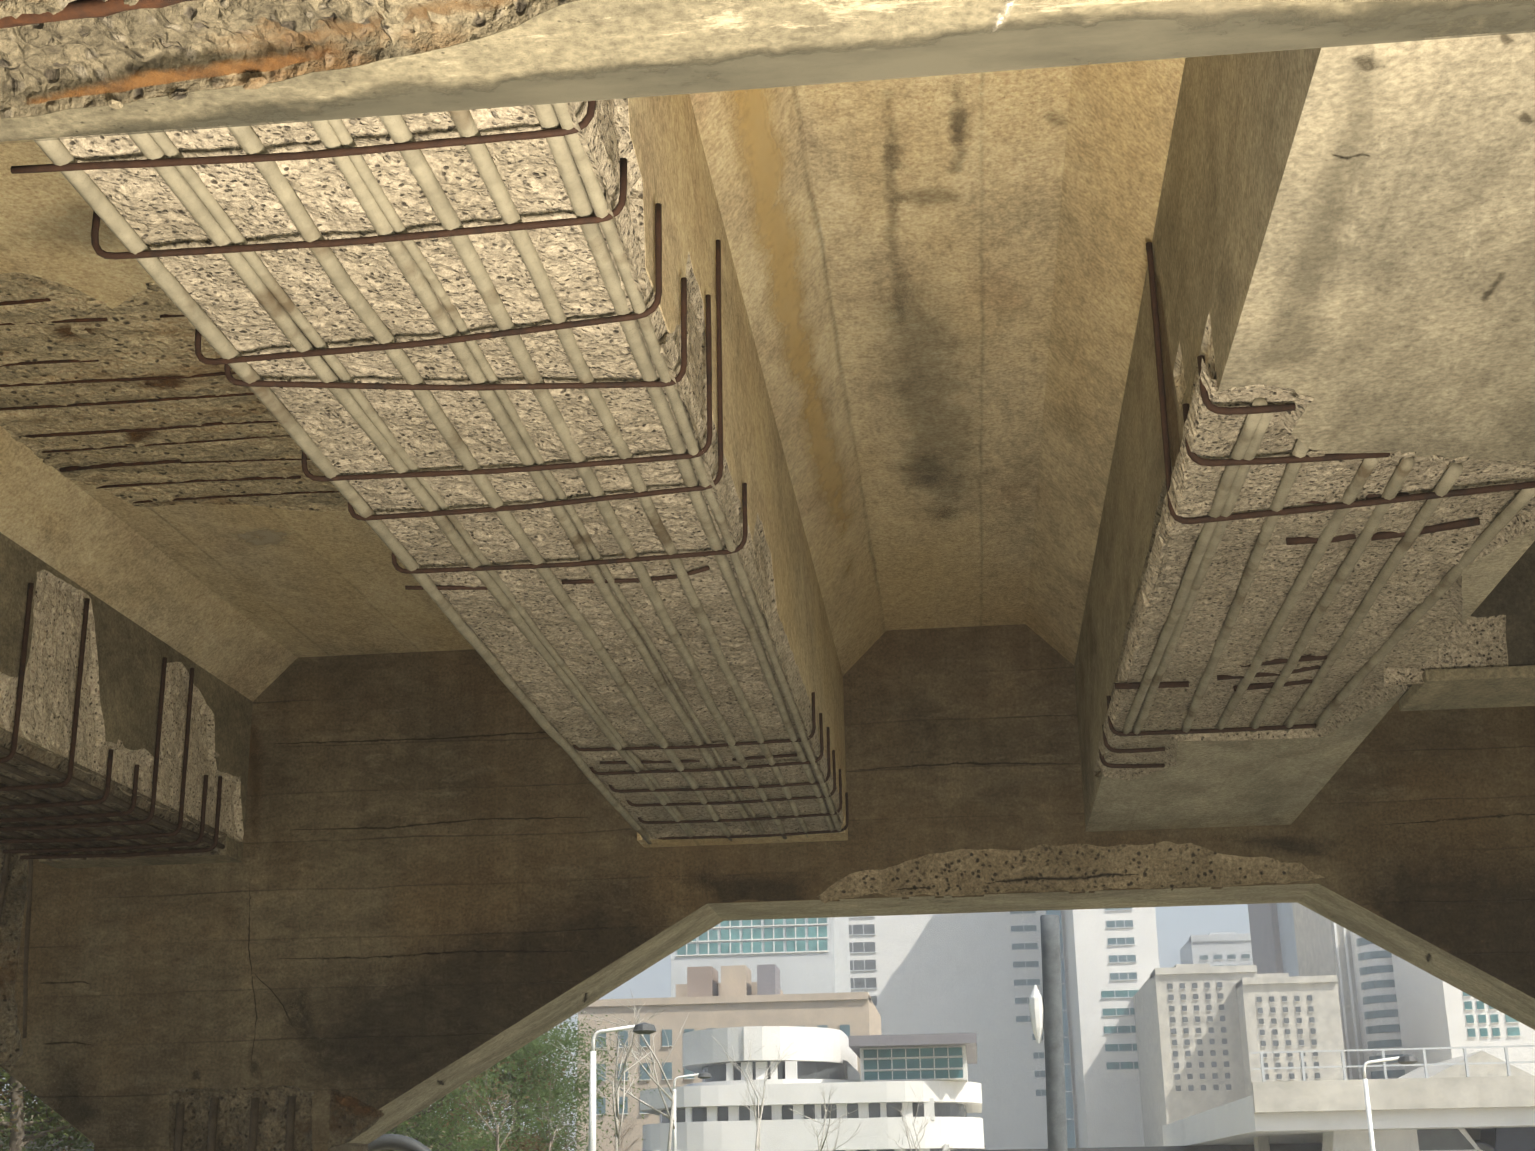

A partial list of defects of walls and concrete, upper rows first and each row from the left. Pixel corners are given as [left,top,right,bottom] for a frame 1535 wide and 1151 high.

corrosion [32,51,330,104]
spalling [0,0,576,118]
water stain [35,0,1535,525]
spalling [0,98,849,861]
spalling [1093,242,1535,781]
spalling [817,841,1324,904]
spalling [168,1085,385,1151]